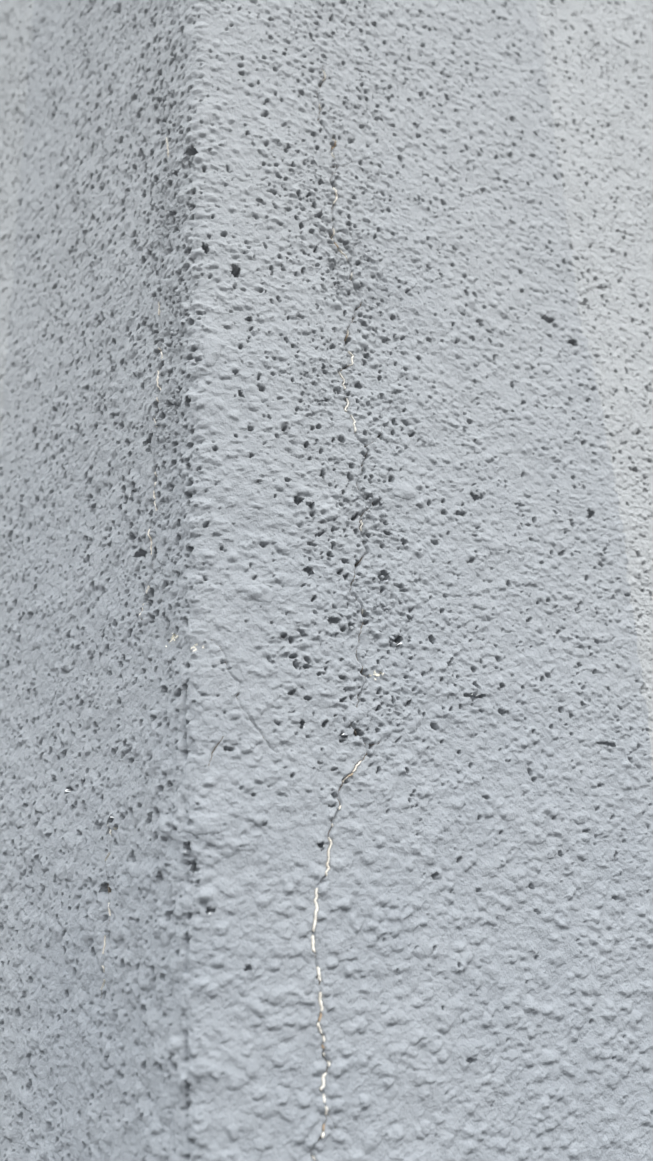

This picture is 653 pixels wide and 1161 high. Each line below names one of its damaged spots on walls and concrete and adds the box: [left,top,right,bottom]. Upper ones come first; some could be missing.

crack [309,67,382,1161]